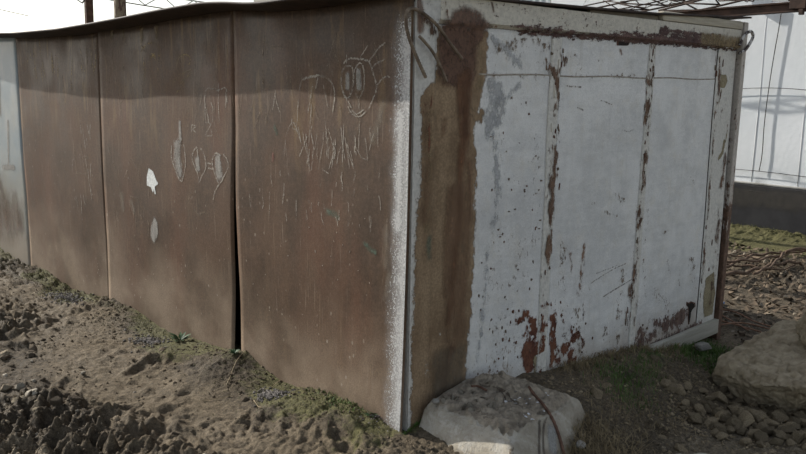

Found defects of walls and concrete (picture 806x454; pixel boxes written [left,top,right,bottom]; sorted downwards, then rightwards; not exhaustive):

corrosion [508,5,741,55]
corrosion [417,0,498,398]
corrosion [634,307,702,348]